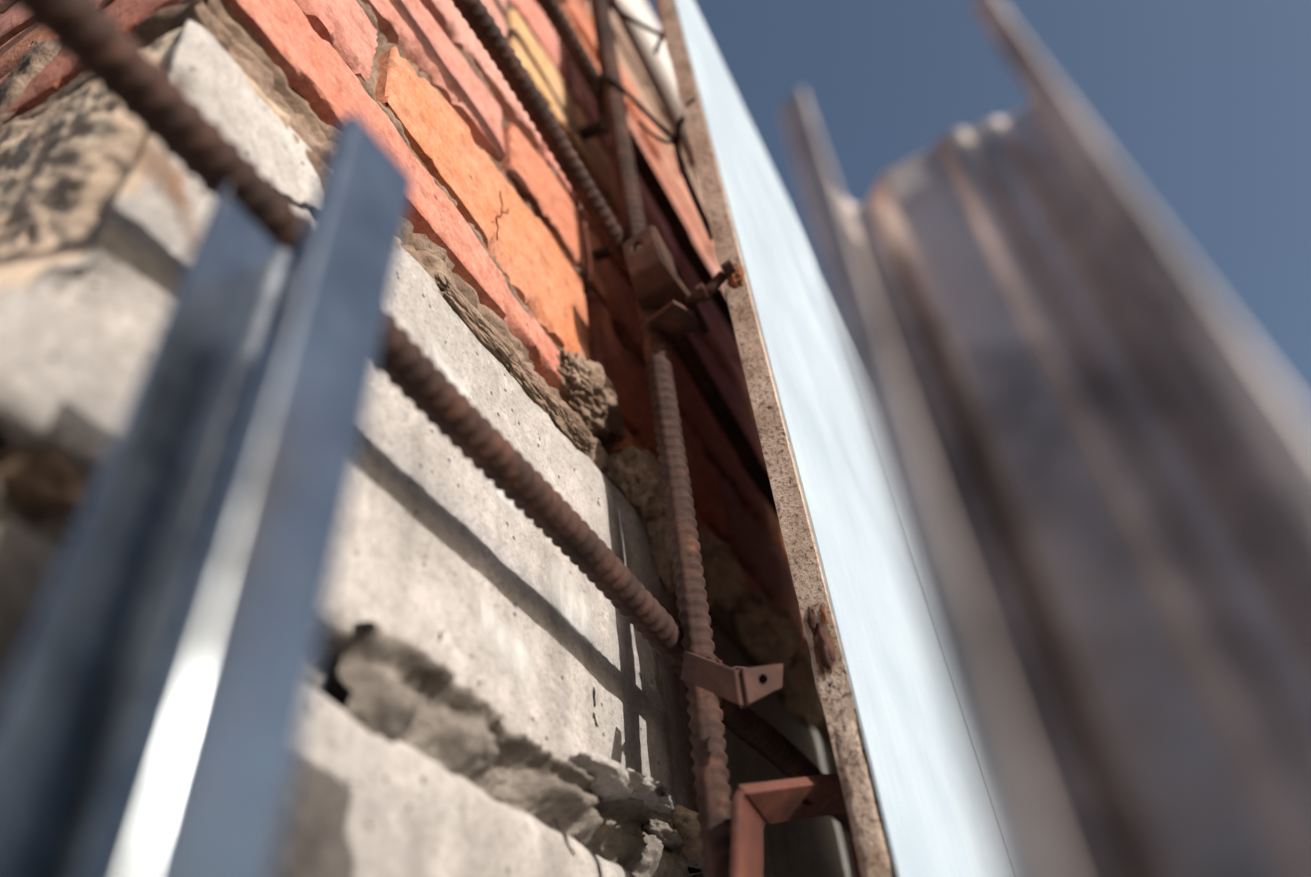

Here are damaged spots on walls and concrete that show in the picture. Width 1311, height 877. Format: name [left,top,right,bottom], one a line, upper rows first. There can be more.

spalling [0,0,308,261]
crack [495,190,509,240]
spalling [310,0,824,877]
rust [812,604,829,680]
spalling [831,813,849,832]